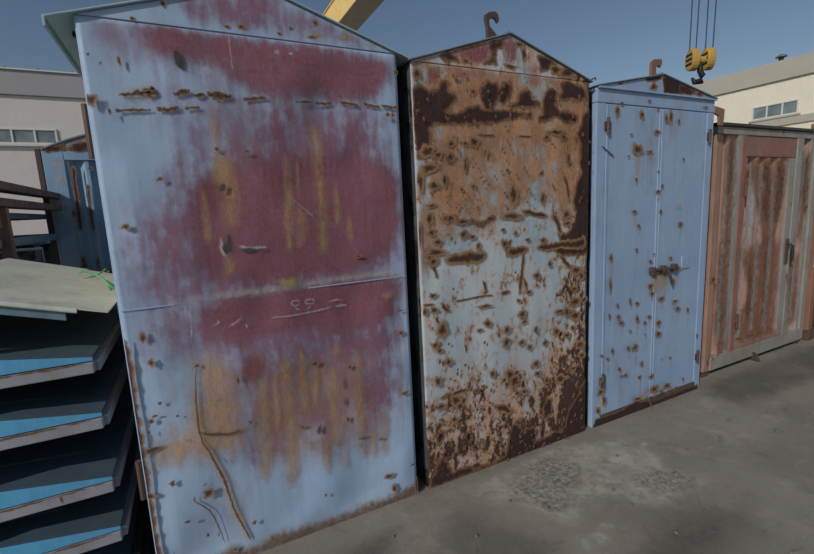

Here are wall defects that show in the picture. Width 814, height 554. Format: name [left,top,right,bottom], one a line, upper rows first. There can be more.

corrosion [86,94,98,107]
corrosion [645,76,709,124]
corrosion [43,141,88,153]
corrosion [71,166,94,232]
corrosion [799,150,811,233]
corrosion [412,38,698,489]
corrosion [711,135,789,354]
corrosion [159,359,243,460]
corrosion [225,473,418,554]